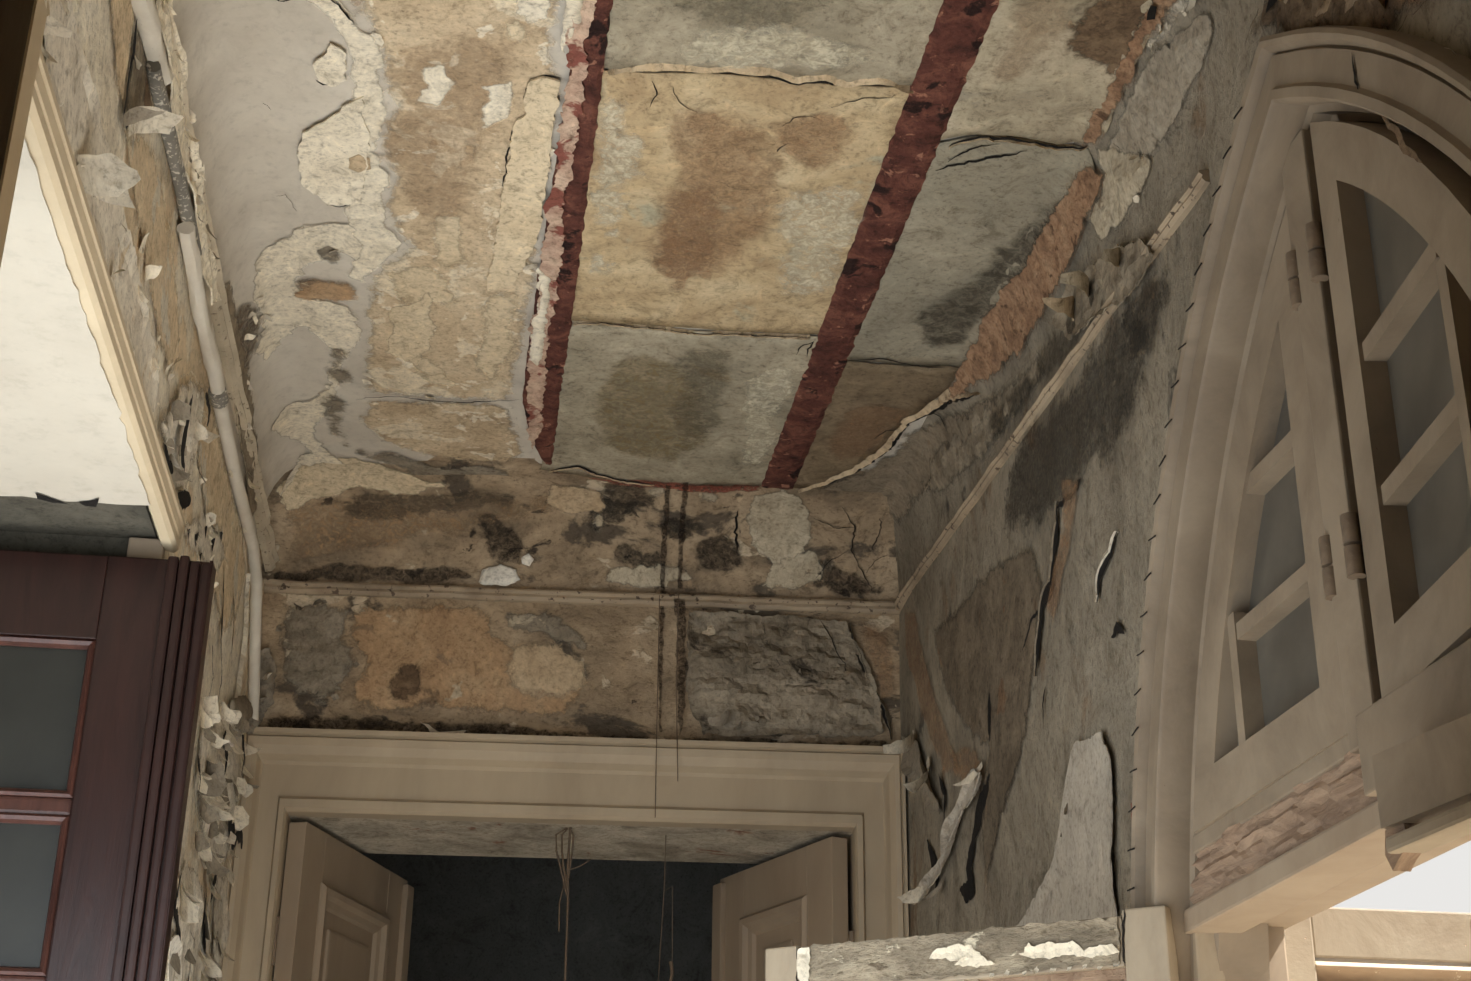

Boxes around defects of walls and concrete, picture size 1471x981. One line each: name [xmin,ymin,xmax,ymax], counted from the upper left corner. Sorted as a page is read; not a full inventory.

leakage [680,0,870,69]
peeling [41,0,560,632]
leakage [655,114,859,294]
leakage [919,220,1047,345]
crack [936,134,1088,171]
flaking render [821,0,1215,522]
leakage [274,491,551,584]
leakage [590,483,665,531]
peeling [276,598,586,733]
peeling [897,550,1042,905]
peeling [165,696,262,981]
peeling [797,732,1121,981]